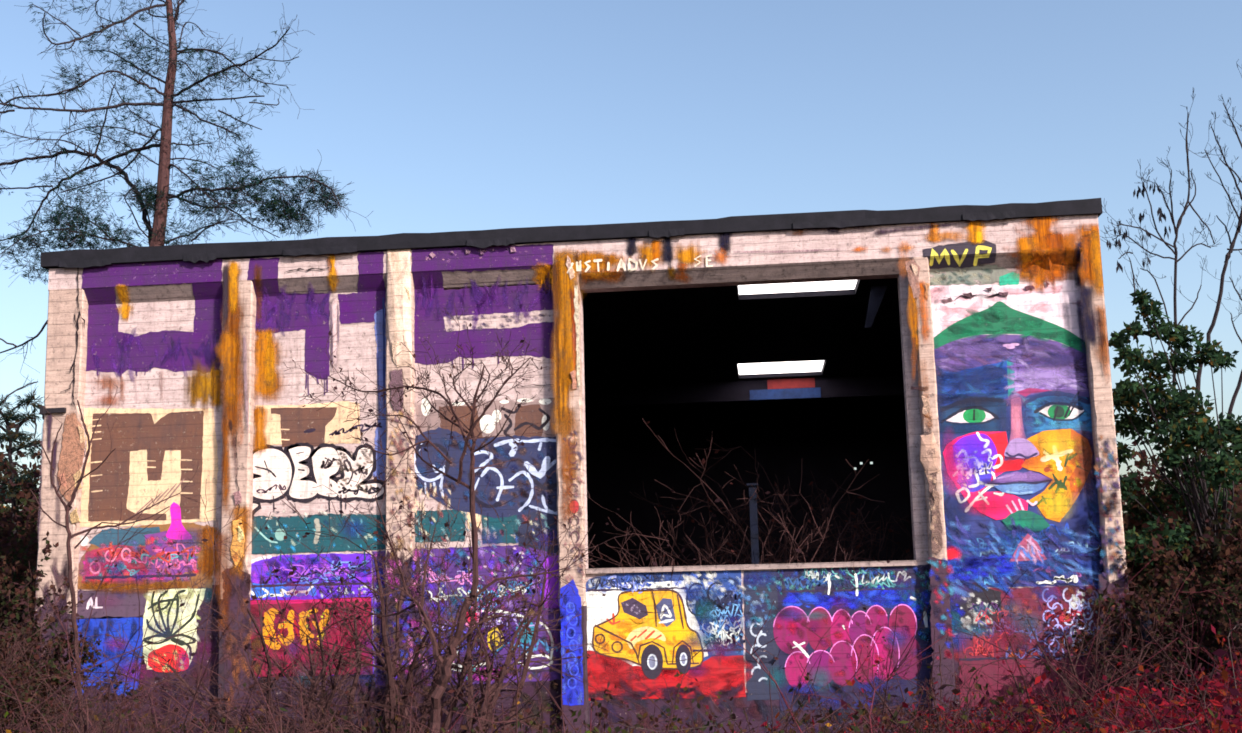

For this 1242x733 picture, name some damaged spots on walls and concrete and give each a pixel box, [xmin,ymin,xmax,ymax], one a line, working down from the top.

corrosion [116,285,131,320]
corrosion [638,240,726,282]
corrosion [1012,216,1110,372]
corrosion [188,262,281,623]
corrosion [536,250,623,515]
corrosion [83,580,186,593]